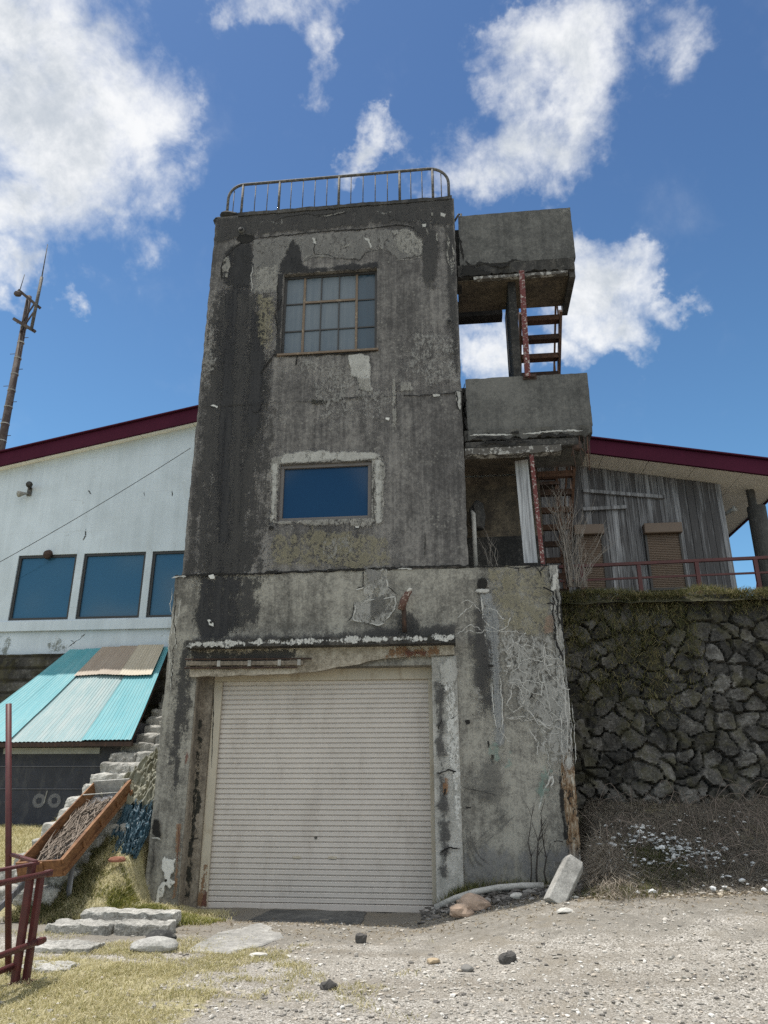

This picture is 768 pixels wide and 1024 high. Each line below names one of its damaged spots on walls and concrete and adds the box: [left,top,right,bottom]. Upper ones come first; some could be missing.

damp [214,199,458,376]
spalling [168,569,454,694]
damp [168,273,512,898]